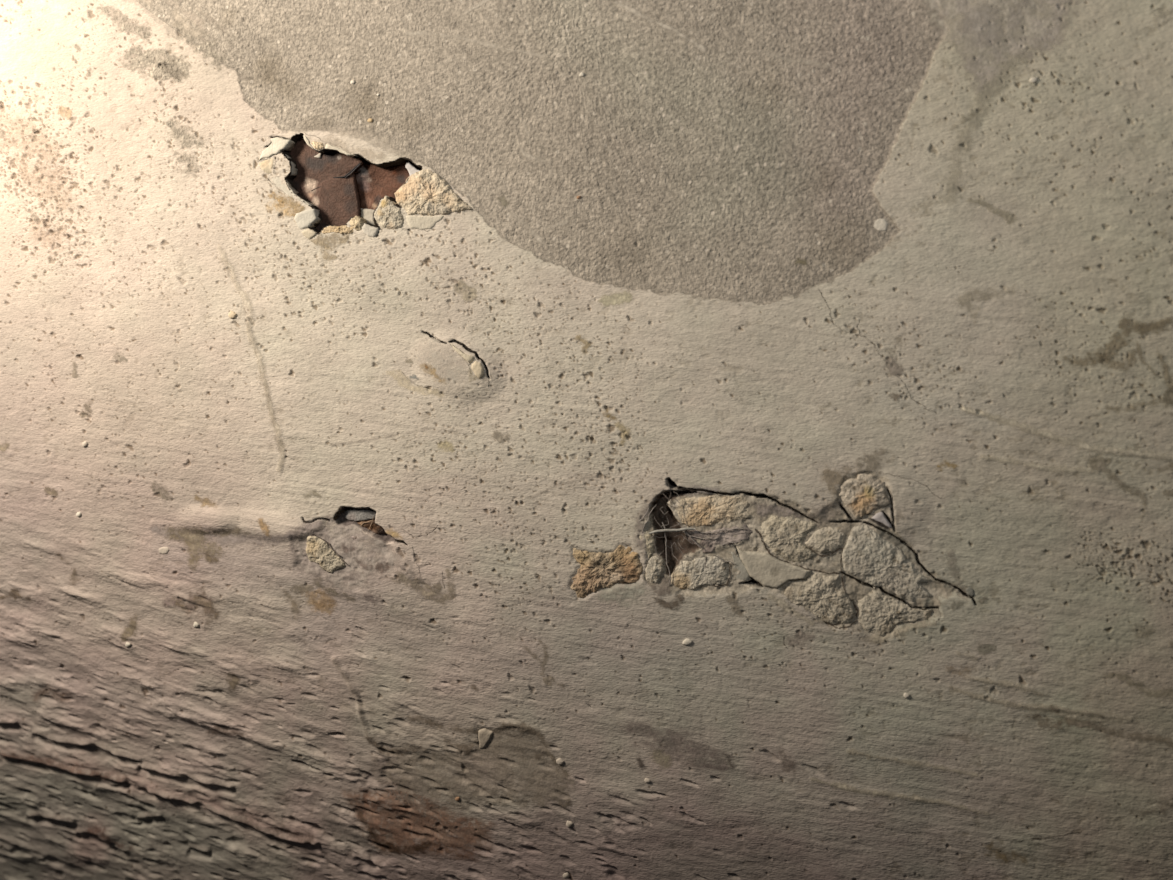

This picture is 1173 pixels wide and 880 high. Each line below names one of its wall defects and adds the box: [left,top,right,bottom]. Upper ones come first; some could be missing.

peeling [97,0,948,305]
spalling [151,507,455,603]
spalling [571,450,987,648]